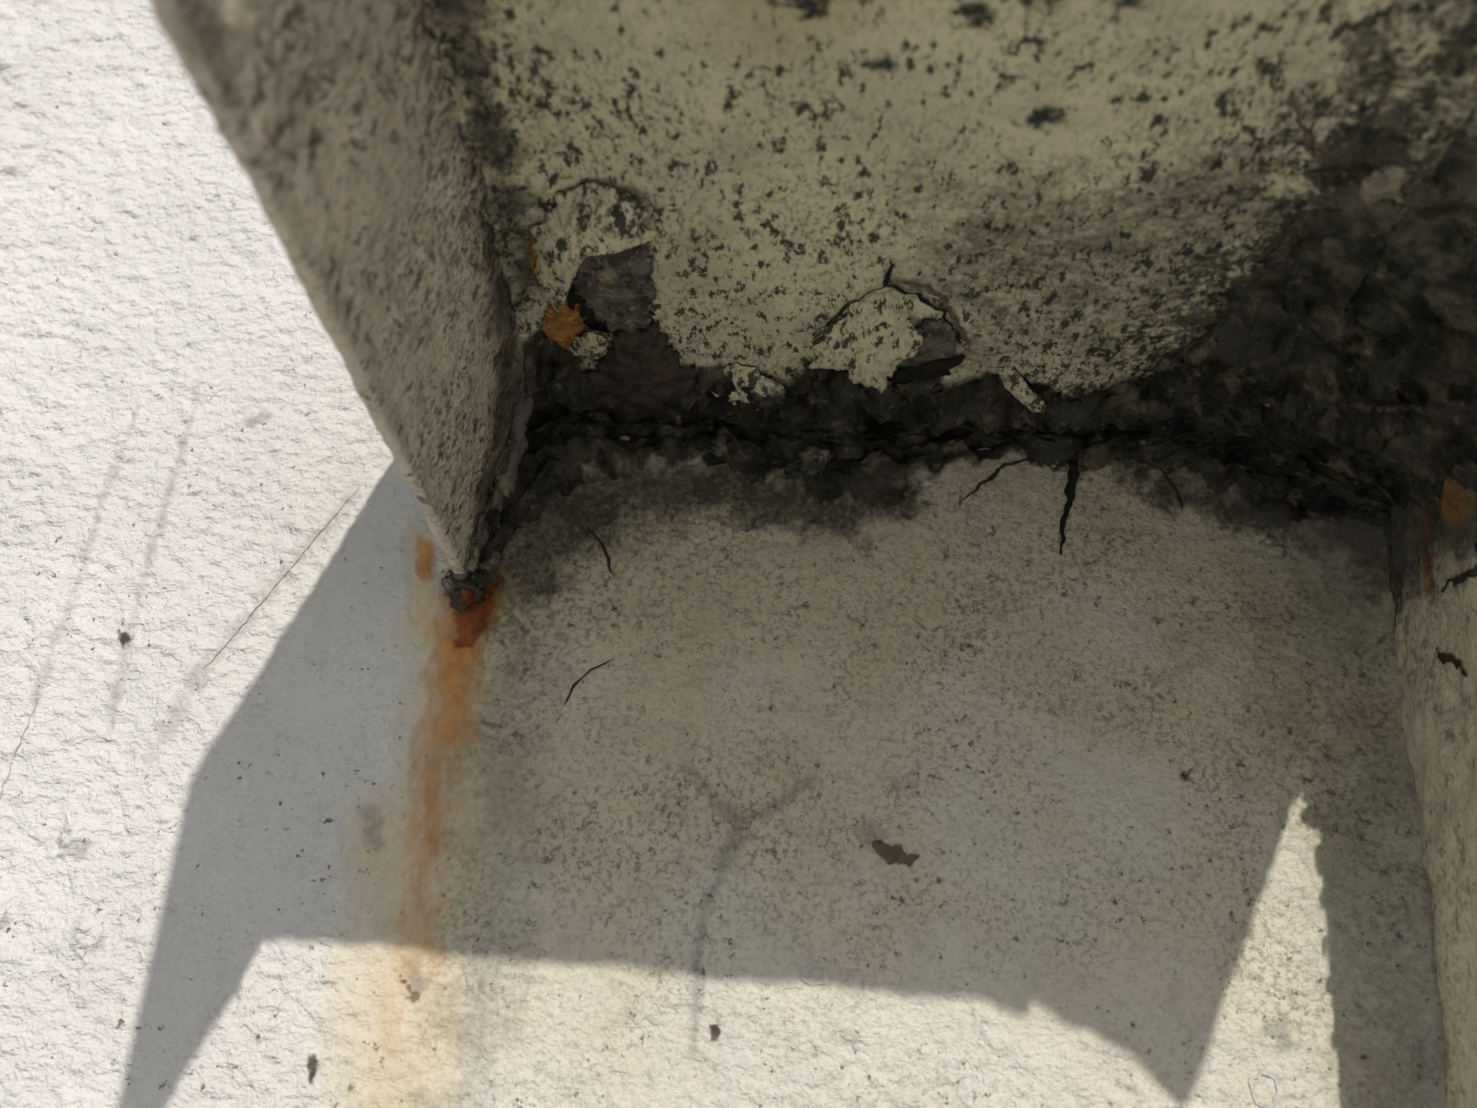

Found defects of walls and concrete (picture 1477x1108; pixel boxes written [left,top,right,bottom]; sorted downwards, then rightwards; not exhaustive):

spalling [529,181,699,414]
spalling [809,259,970,393]
damp [430,0,1477,614]
peeling [712,362,787,411]
peeling [994,366,1048,413]
crack [958,456,1080,555]
crack [1143,462,1184,509]
crack [1441,542,1477,593]
rust [436,575,505,743]
crack [1435,646,1467,678]